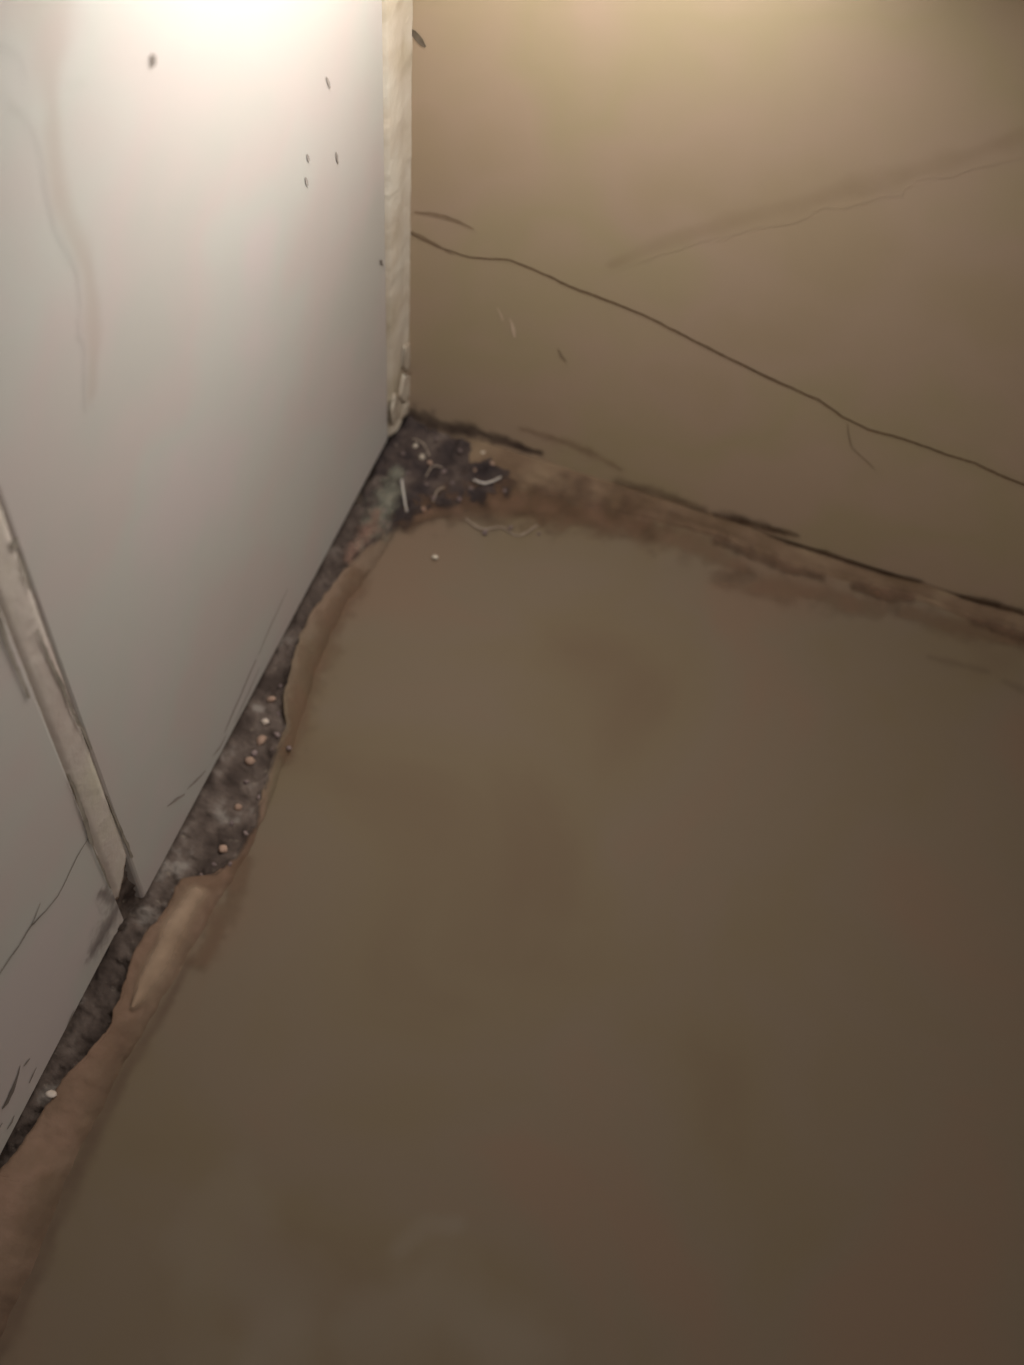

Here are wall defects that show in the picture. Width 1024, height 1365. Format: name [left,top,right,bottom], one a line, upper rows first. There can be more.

crack [410,211,1024,486]
damp [80,882,123,977]